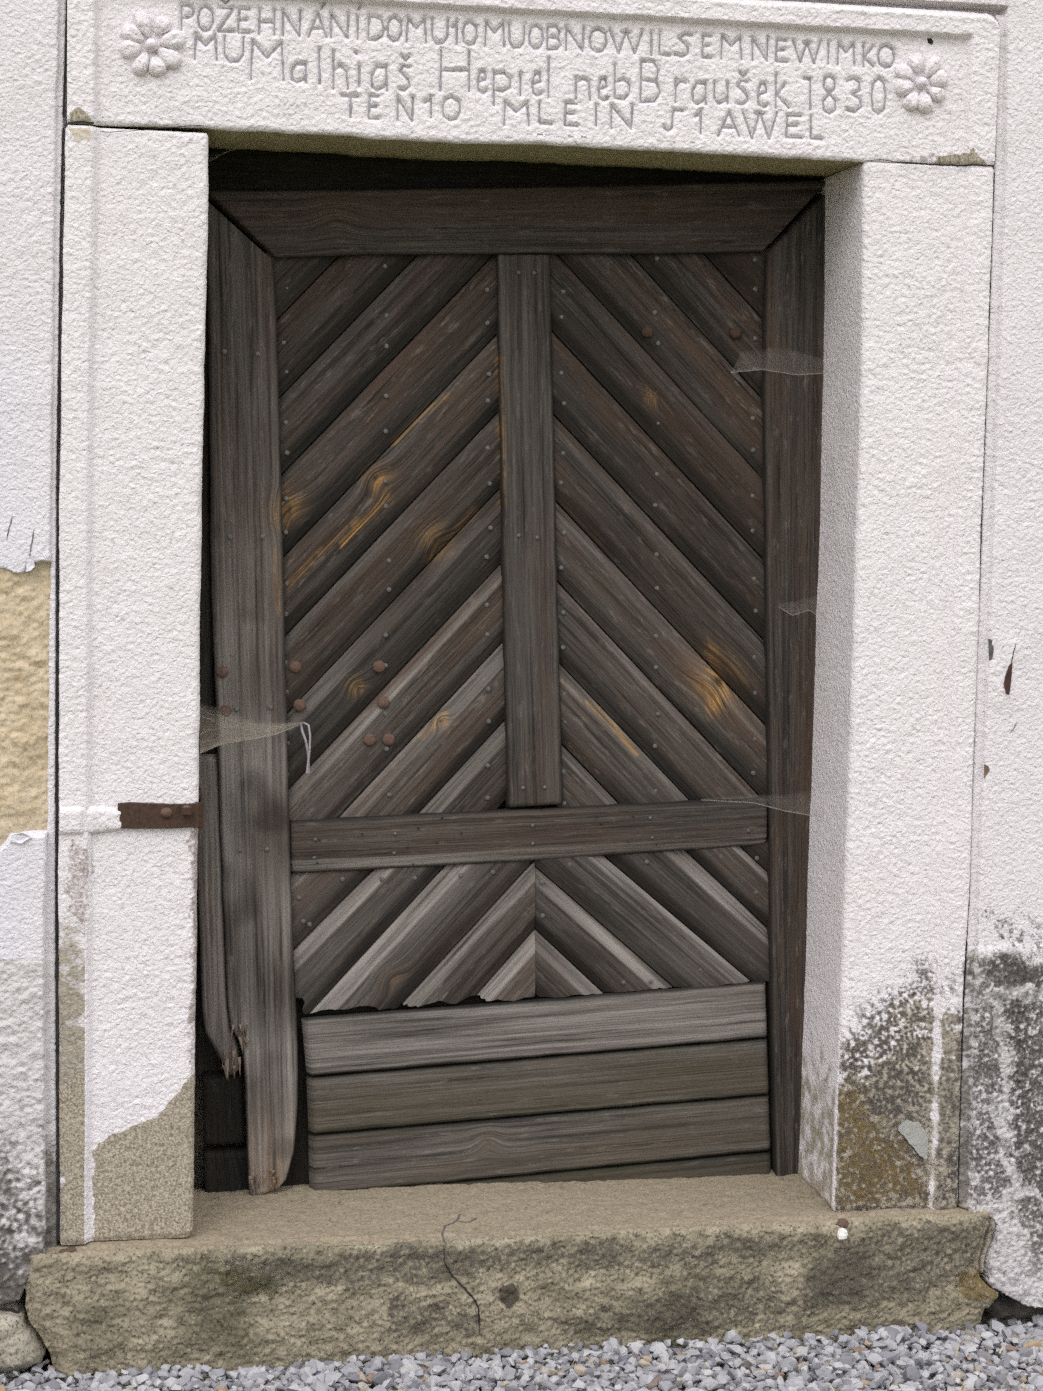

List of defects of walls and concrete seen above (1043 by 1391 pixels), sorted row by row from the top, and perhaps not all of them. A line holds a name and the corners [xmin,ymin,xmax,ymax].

spalling [0,556,51,846]
leakage [224,910,1043,1336]